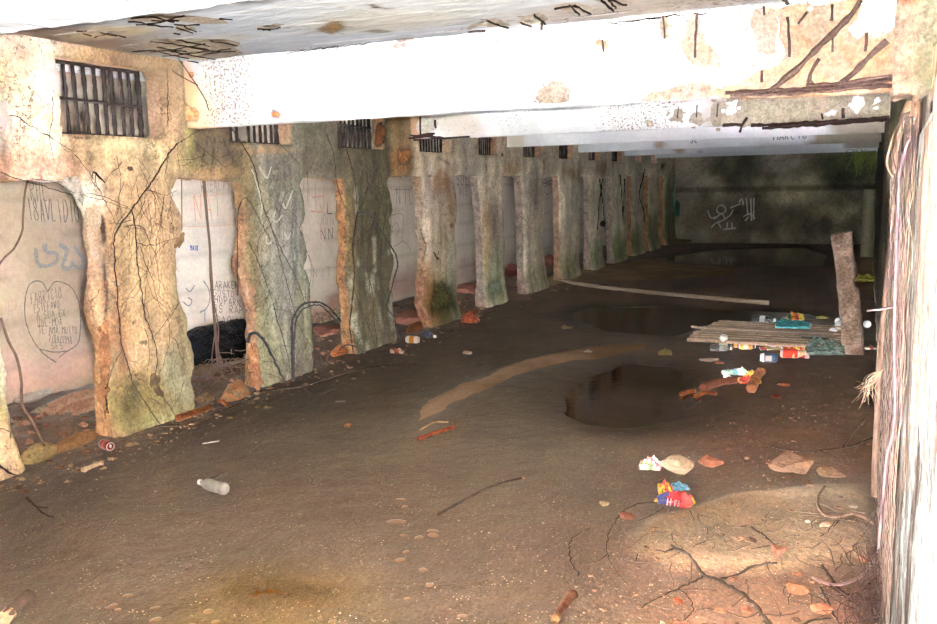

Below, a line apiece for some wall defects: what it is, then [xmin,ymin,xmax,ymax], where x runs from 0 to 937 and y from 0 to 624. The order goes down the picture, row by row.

spalling [467,0,633,33]
peeling [595,39,610,55]
spalling [641,0,895,133]
peeling [533,79,572,104]
spalling [62,176,103,270]
water stain [430,281,455,315]